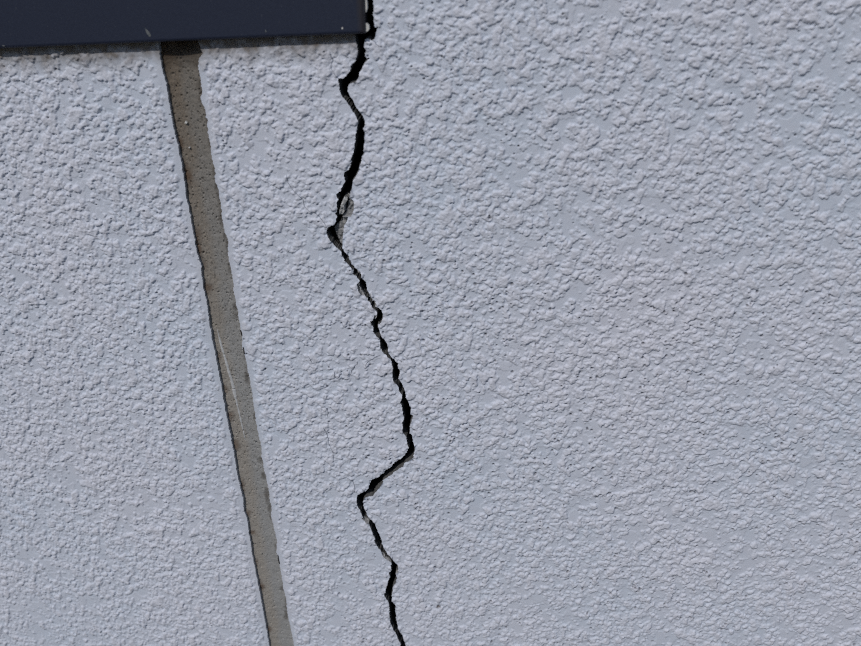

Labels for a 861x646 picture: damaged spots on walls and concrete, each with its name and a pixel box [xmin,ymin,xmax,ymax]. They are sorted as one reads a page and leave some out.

crack [286,0,415,646]